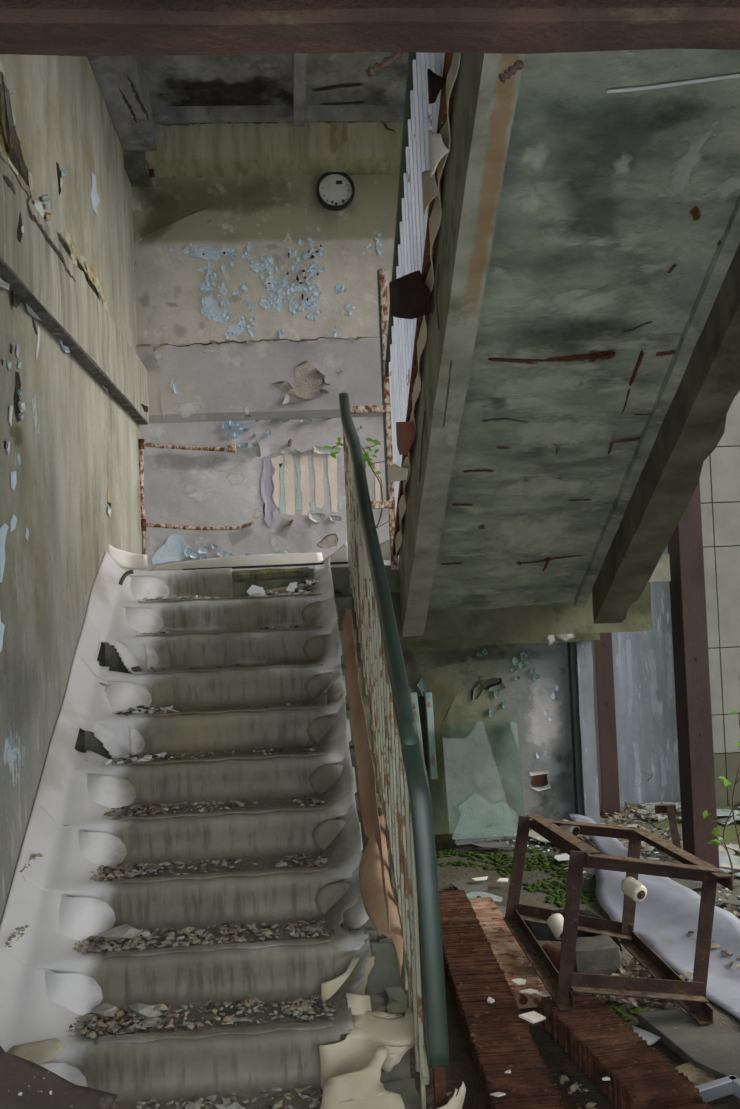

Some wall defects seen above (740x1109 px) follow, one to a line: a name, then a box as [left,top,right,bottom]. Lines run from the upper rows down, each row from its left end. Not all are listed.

leakage [166,75,292,106]
spalling [0,60,67,220]
leakage [521,145,547,170]
leakage [669,130,716,193]
peeling [91,173,100,216]
peeling [64,229,108,311]
peeling [169,238,325,340]
spalling [271,361,330,405]
rust [490,350,615,364]
peeling [222,414,342,527]
peeling [0,513,29,584]
rust [517,555,583,571]